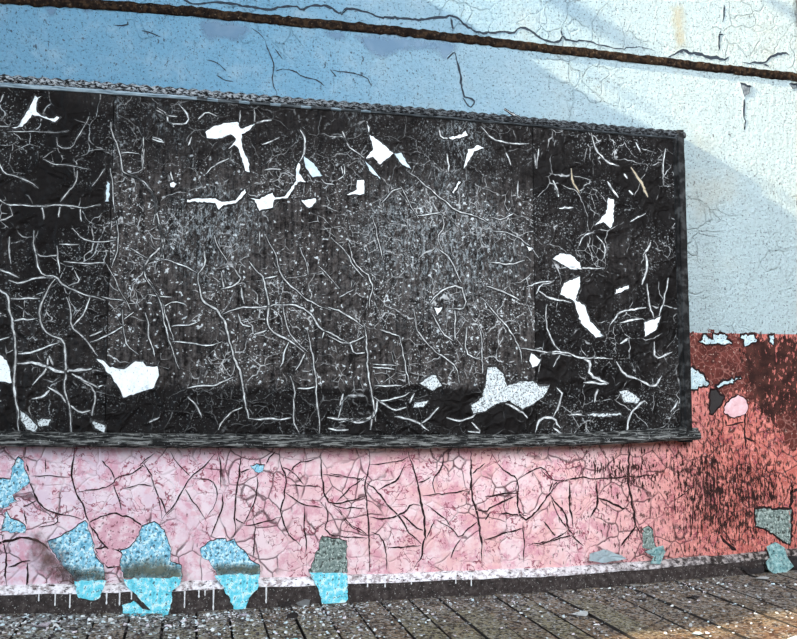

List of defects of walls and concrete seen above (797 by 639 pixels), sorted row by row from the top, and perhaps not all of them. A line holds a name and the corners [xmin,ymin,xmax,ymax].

crack [182,0,790,94]
crack [446,52,476,108]
crack [740,99,748,130]
peeling [204,120,256,174]
peeling [343,117,412,197]
peeling [551,252,605,339]
crack [0,103,672,585]
peeling [95,357,160,399]
peeling [469,365,550,415]
peeling [666,329,797,552]
crack [715,510,737,551]
crack [788,481,797,538]